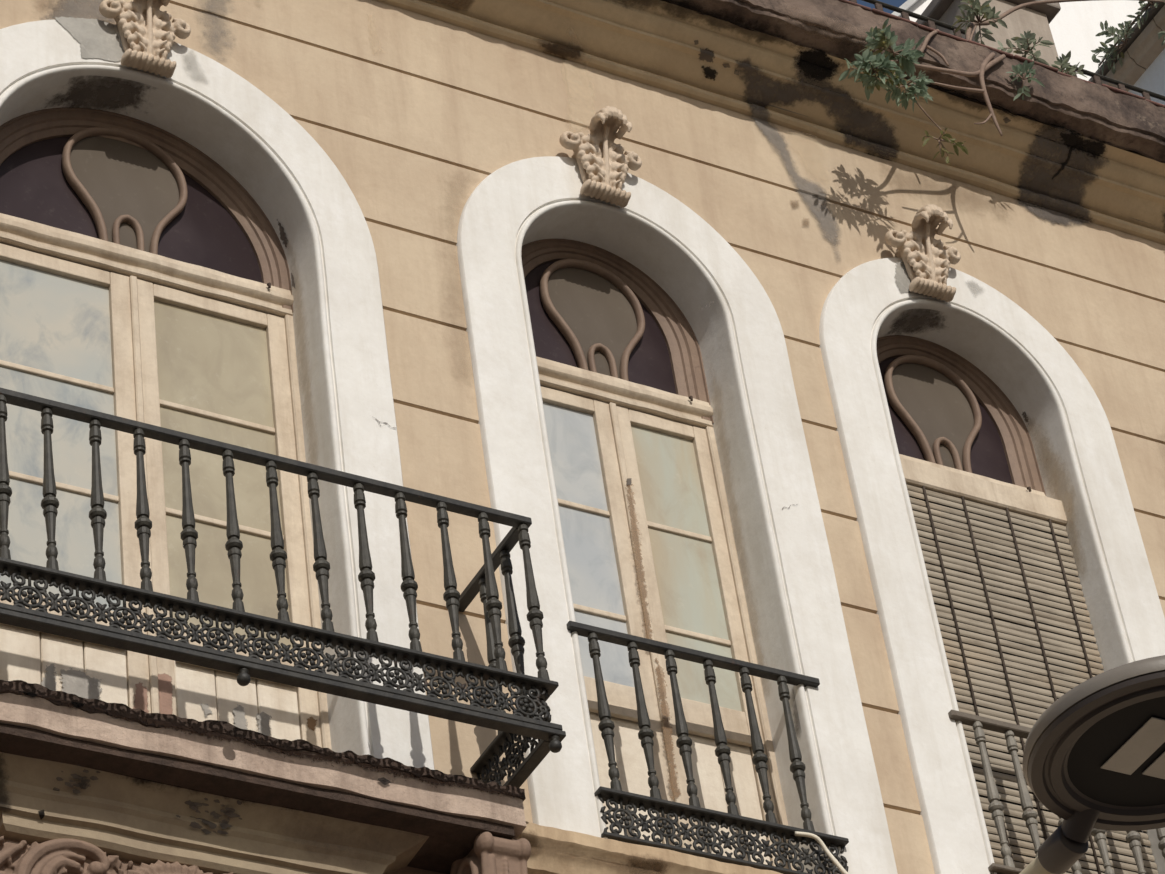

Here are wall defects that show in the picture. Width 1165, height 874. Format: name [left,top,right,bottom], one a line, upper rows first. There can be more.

peeling [55,16,124,63]
water stain [48,76,150,110]
water stain [622,0,784,42]
water stain [737,49,899,242]
water stain [929,84,1109,225]
spalling [0,664,526,801]